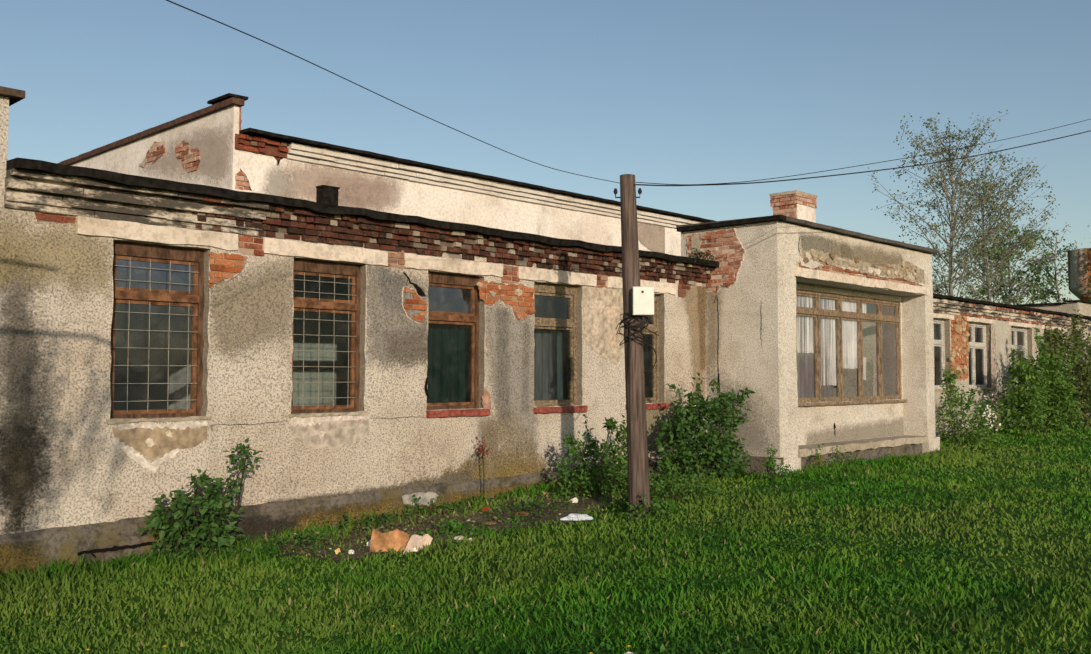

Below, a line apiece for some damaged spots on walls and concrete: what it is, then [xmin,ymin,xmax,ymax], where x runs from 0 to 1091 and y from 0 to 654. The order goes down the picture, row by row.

flaking render [139,141,201,173]
flaking render [208,234,264,290]
flaking render [402,284,427,324]
flaking render [476,265,535,323]
flaking render [677,280,693,299]
flaking render [685,227,746,295]
peeling [796,248,925,295]
flaking render [949,314,981,382]
water stain [0,272,50,534]
water stain [273,307,536,503]
peeling [112,420,208,473]
water stain [241,509,352,539]